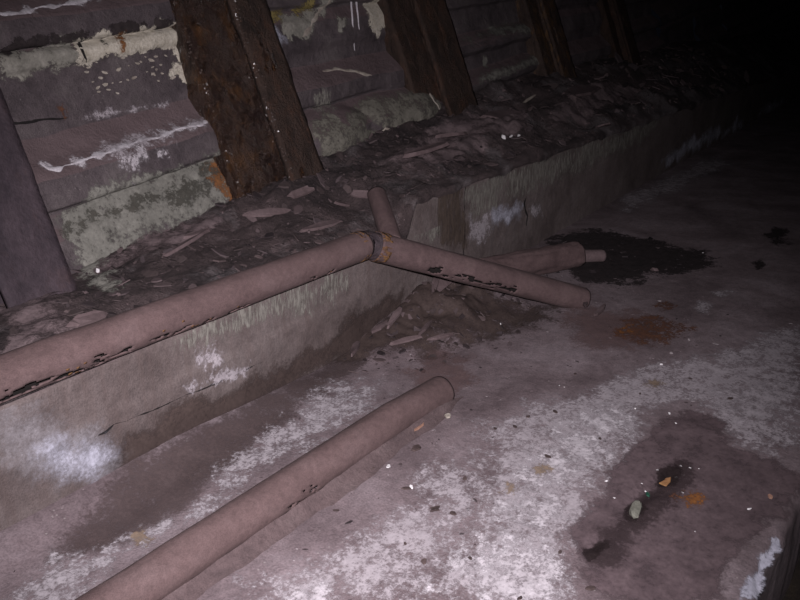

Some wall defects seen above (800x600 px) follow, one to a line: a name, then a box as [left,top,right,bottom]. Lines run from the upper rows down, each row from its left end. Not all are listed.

water stain [39,117,230,293]
water stain [545,228,721,286]
crack [98,362,262,436]
water stain [9,272,561,600]
water stain [245,325,800,600]